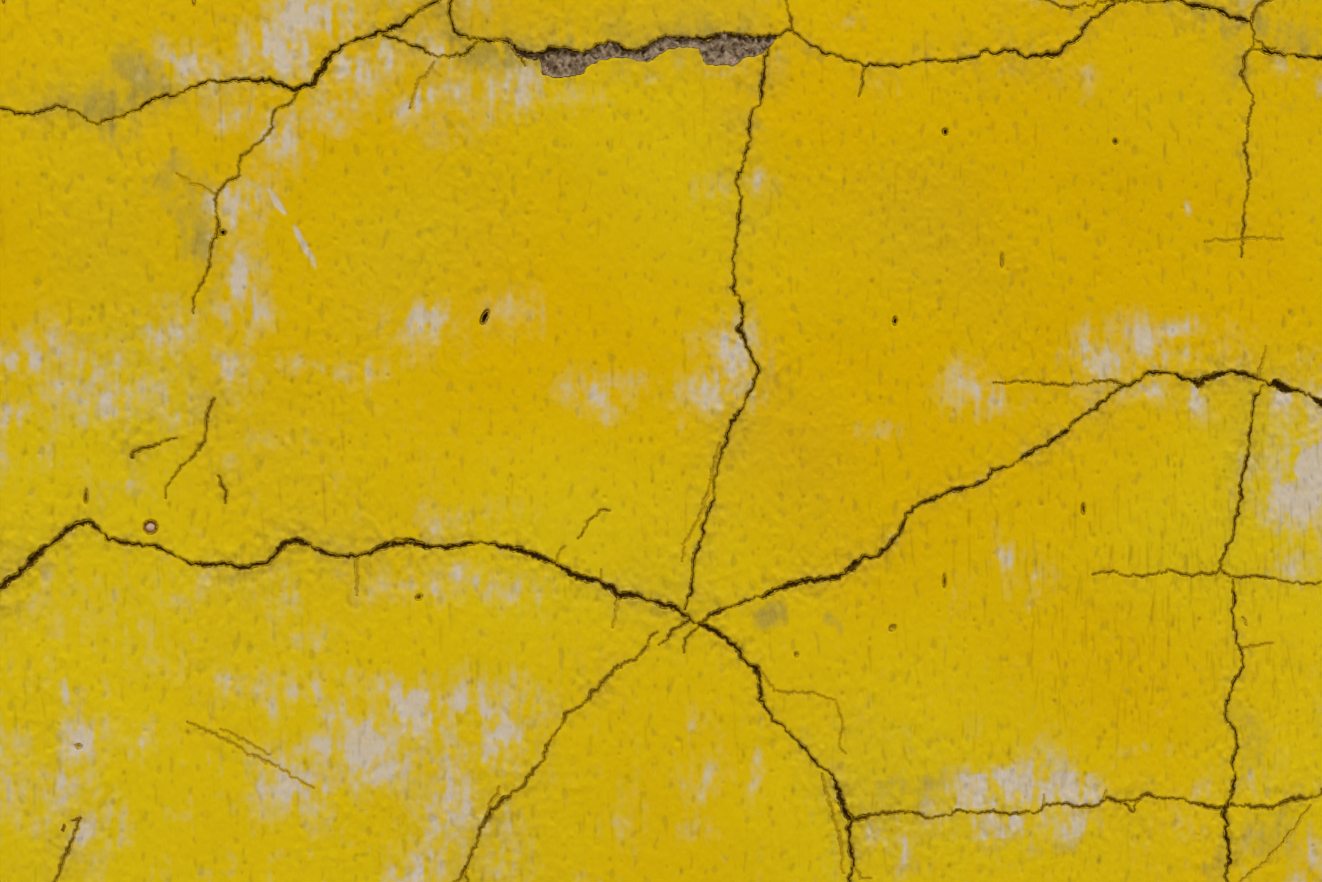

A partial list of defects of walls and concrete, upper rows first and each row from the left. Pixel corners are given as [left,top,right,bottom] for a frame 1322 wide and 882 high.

crack [0,0,526,313]
peeling [0,0,789,503]
crack [681,47,770,610]
peeling [826,3,879,33]
crack [776,0,1322,257]
peeling [0,491,564,882]
crack [0,347,1322,882]
peeling [594,699,769,858]